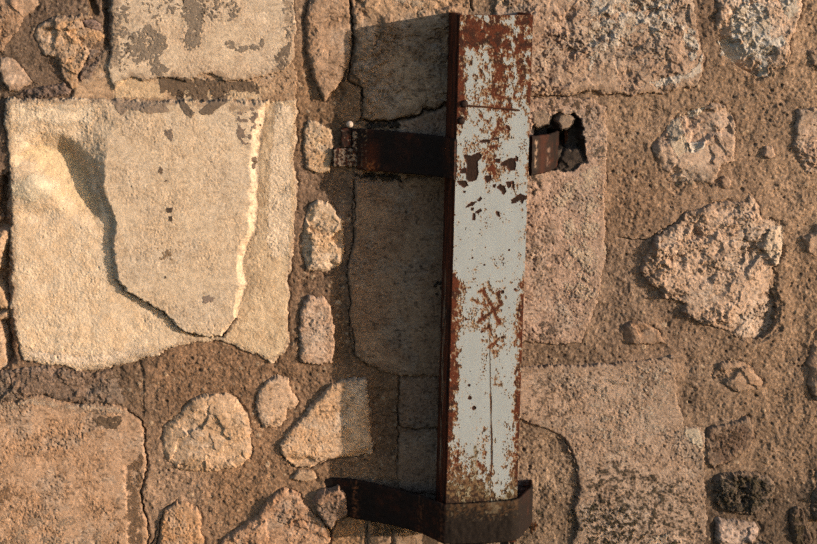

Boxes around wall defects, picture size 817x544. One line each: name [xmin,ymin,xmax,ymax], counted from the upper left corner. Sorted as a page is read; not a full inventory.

rust [352,171,403,183]
rust [446,15,542,504]
peeling [530,110,607,341]
crack [128,410,177,544]